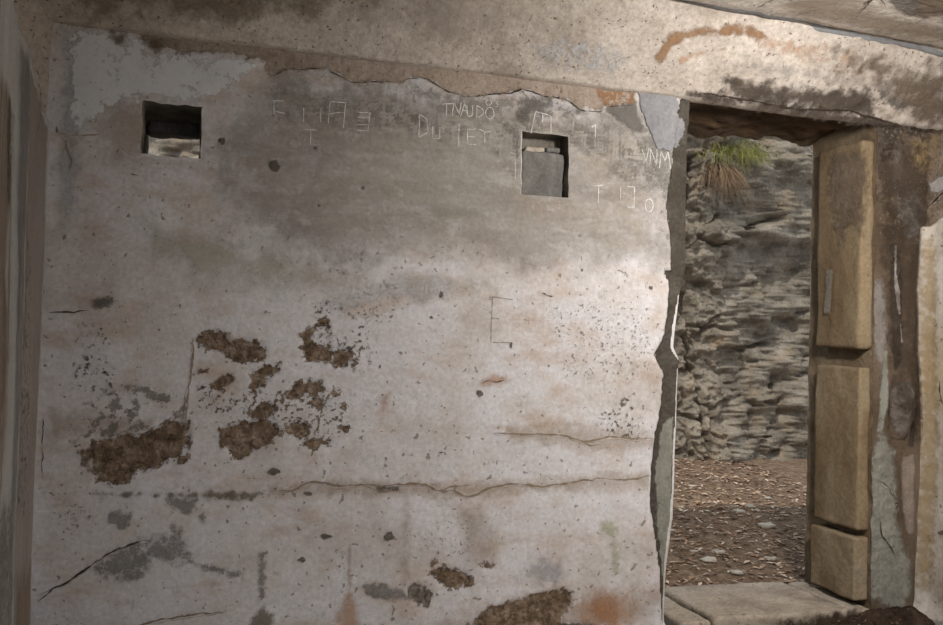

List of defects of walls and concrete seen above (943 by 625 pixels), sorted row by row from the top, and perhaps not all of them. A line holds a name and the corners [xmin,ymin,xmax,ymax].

damp [172,0,327,22]
rust [656,24,766,63]
crack [757,0,940,50]
damp [0,52,48,625]
peeling [136,33,690,609]
damp [687,57,943,618]
flaking render [77,414,193,488]
crack [494,433,653,446]
crack [267,475,649,499]
crack [38,540,147,601]
crack [141,610,228,625]
flaking render [467,586,594,625]